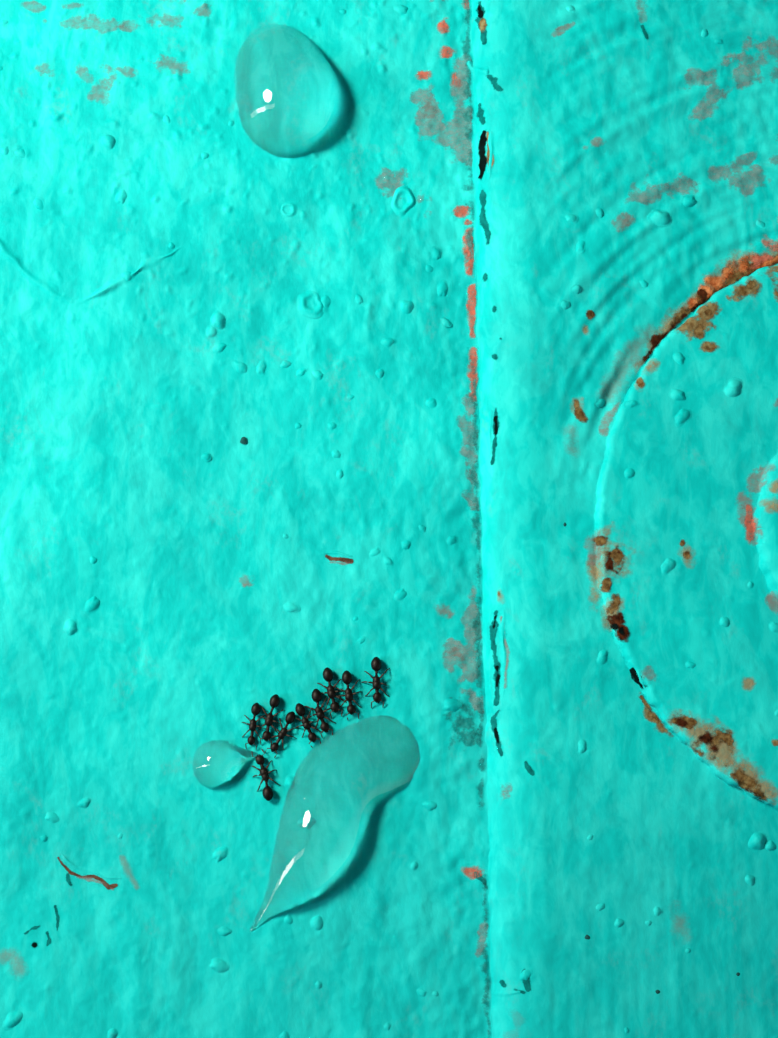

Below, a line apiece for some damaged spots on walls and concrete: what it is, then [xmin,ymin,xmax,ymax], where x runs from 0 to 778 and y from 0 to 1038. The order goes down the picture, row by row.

crack [465,1,503,244]
corrosion [636,240,778,387]
corrosion [574,400,588,423]
corrosion [765,482,778,511]
corrosion [588,532,630,642]
crack [481,609,534,776]
corrosion [640,695,776,801]